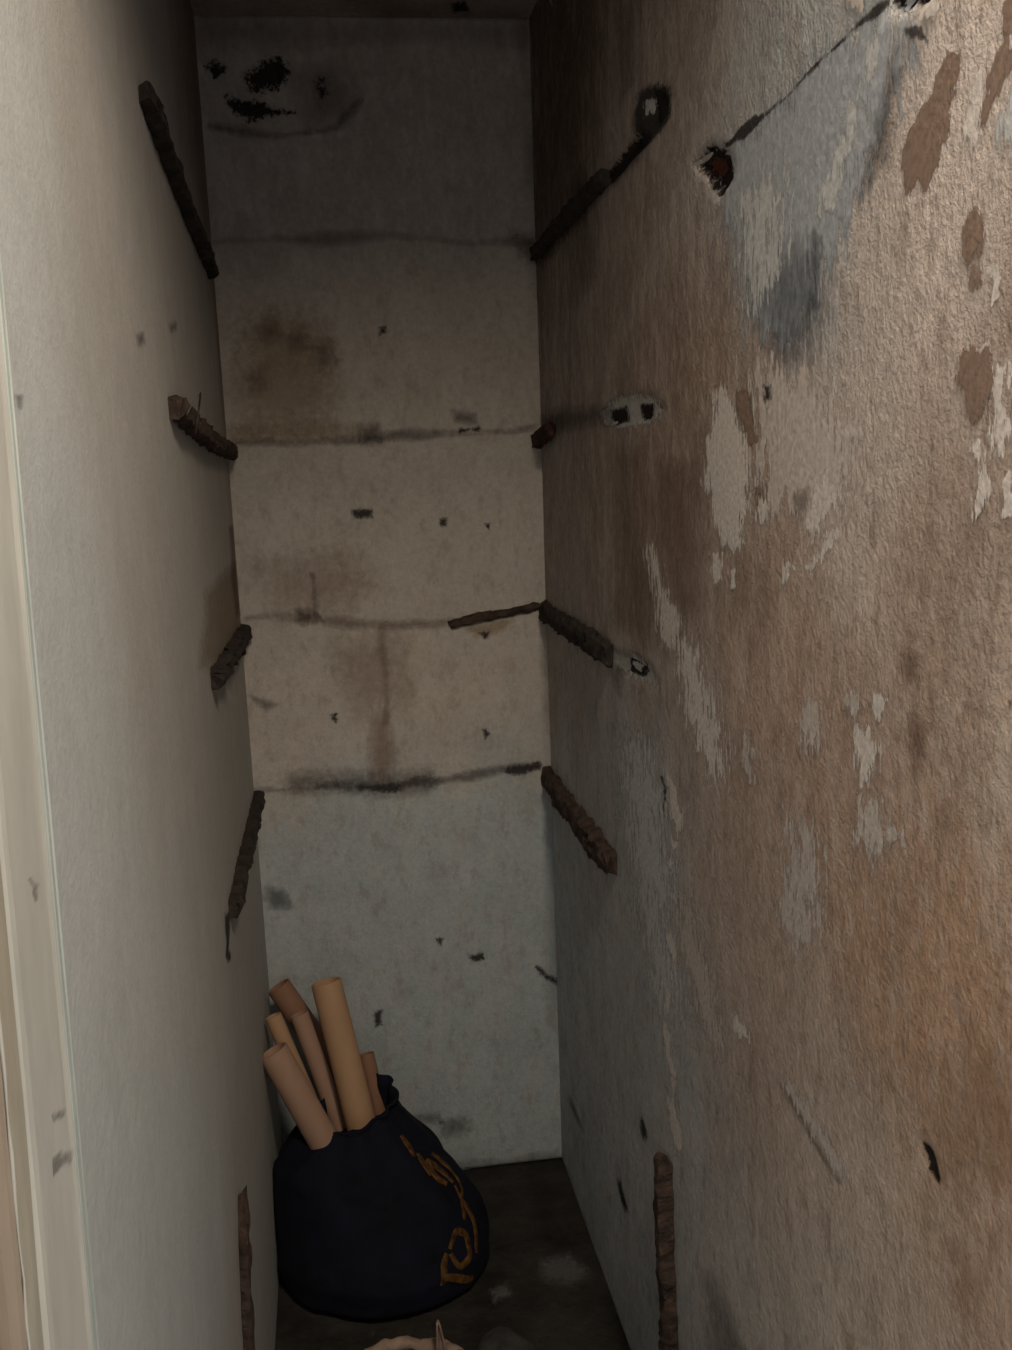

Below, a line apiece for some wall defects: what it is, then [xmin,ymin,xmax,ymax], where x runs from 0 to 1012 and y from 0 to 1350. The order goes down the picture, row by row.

spalling [224,56,296,123]
spalling [698,144,734,196]
crack [725,0,900,148]
damp [717,0,923,355]
peeling [895,0,1012,195]
peeling [962,205,1001,308]
peeling [700,341,895,590]
peeling [955,338,1012,523]
peeling [794,696,827,759]
peeling [843,689,907,877]
peeling [765,803,833,965]